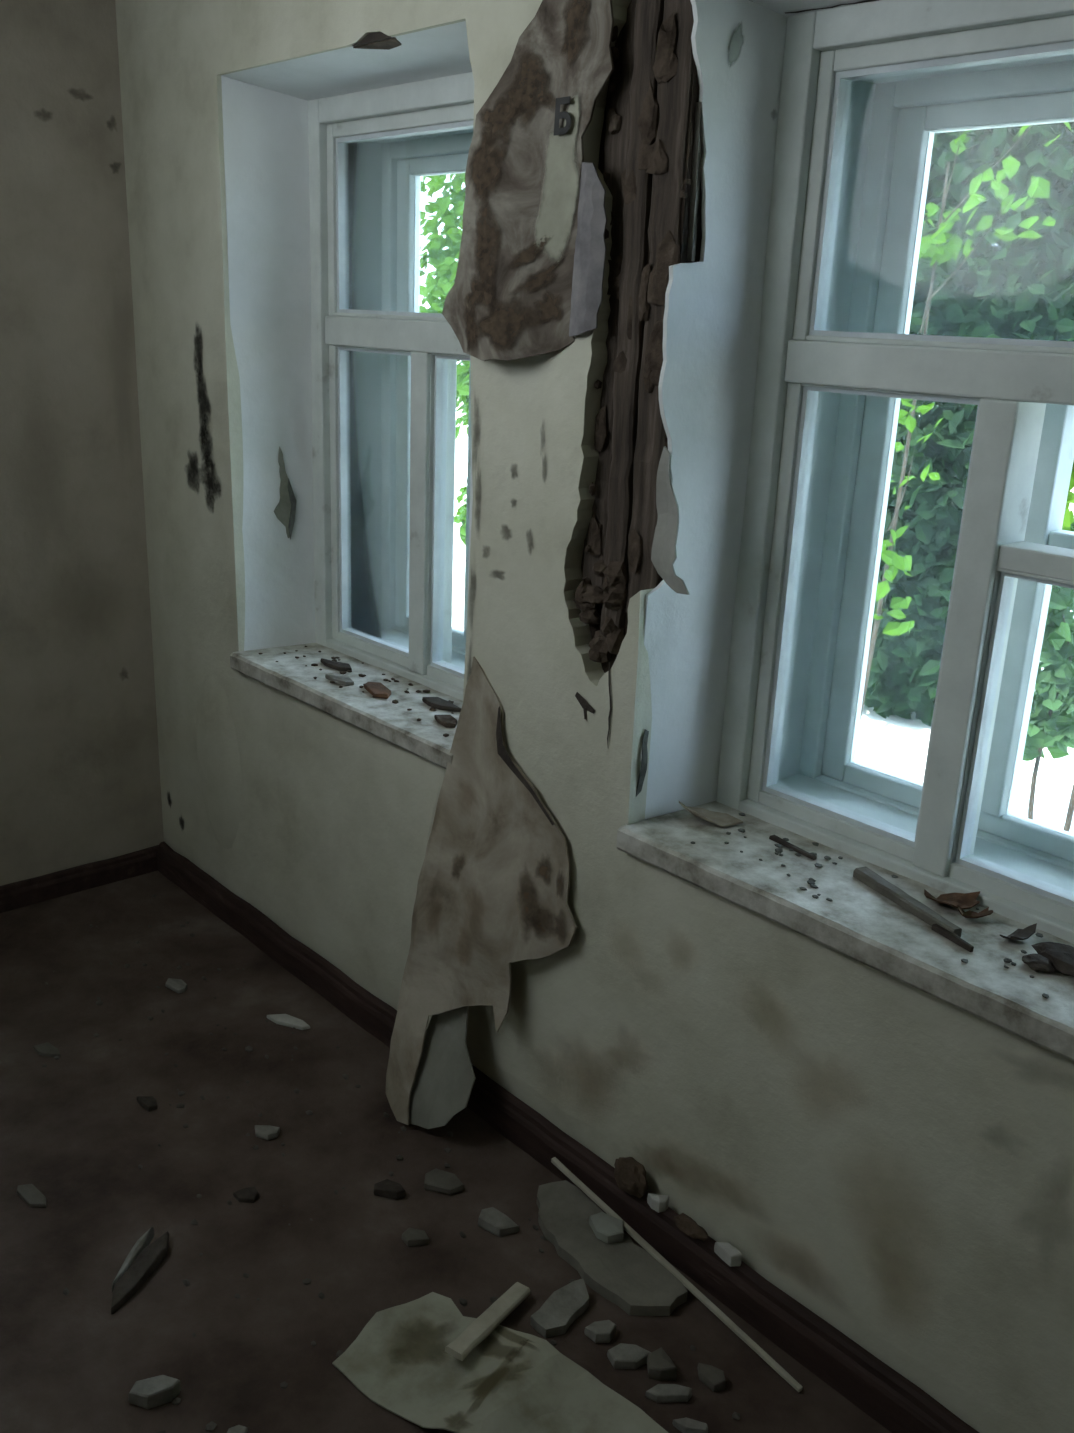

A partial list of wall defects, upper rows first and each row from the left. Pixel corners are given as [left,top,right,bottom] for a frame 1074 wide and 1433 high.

peeling [274,446,296,540]
flaking render [422,697,461,728]